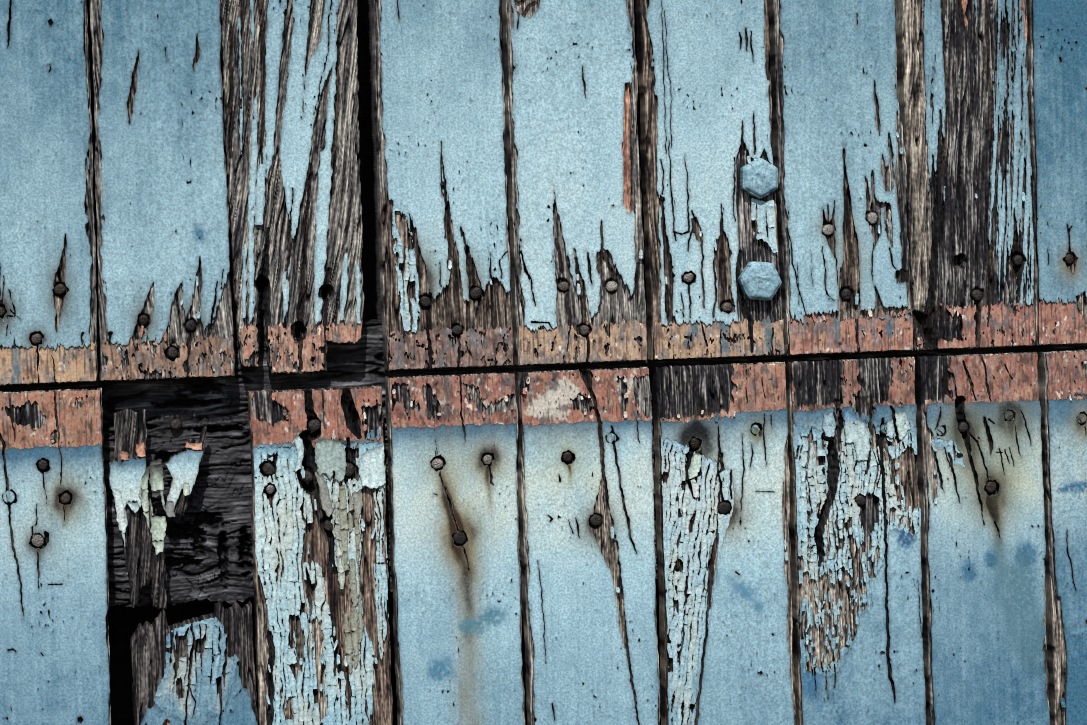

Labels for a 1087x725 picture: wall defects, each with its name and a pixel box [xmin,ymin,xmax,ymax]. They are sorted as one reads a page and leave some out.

peeling [153,0,364,379]
peeling [804,0,1034,323]
rust [52,484,81,516]
peeling [112,459,190,555]
peeling [216,602,271,725]
peeling [292,479,392,725]
peeling [358,169,530,441]
rust [440,473,479,644]
rust [475,445,501,490]
crack [390,0,1072,725]
peeling [782,459,879,669]
rust [950,409,1008,540]